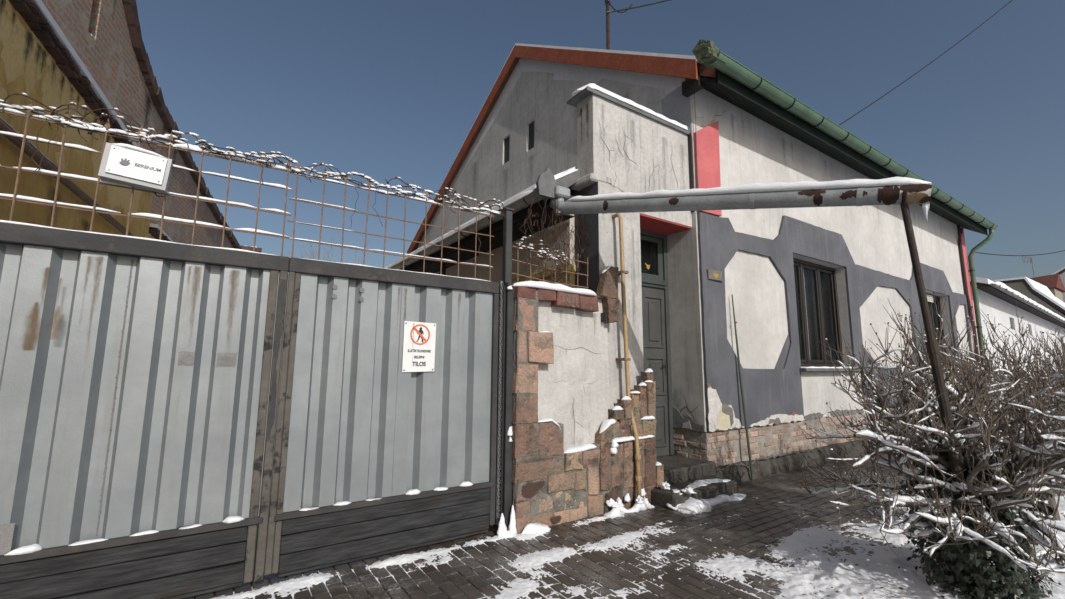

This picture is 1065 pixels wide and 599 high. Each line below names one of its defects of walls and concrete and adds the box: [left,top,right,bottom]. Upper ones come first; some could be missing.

peeling [0,0,141,226]
crack [600,122,678,192]
rust [798,189,826,206]
rust [839,184,932,205]
peeling [673,383,864,432]